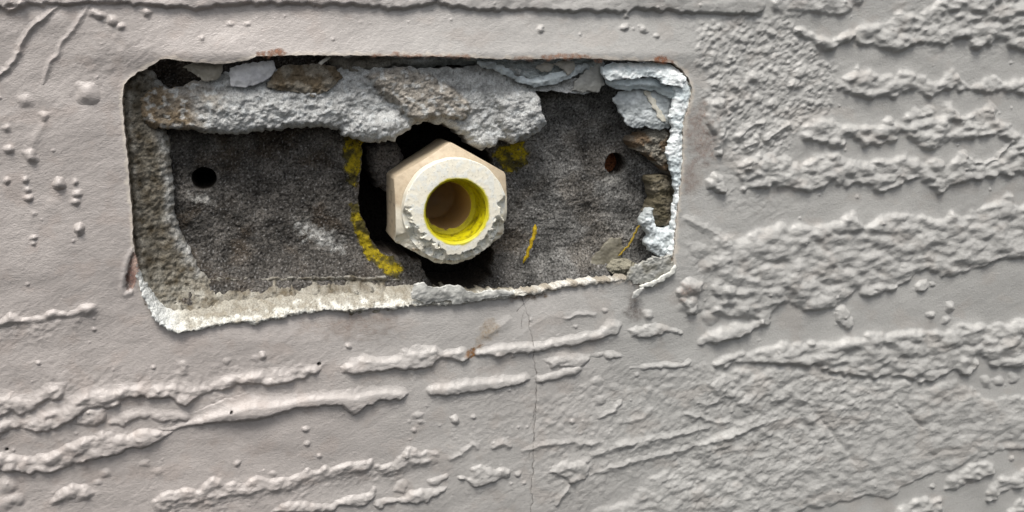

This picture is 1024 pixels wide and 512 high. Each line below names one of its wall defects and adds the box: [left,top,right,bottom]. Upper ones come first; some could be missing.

spalling [126,56,691,334]